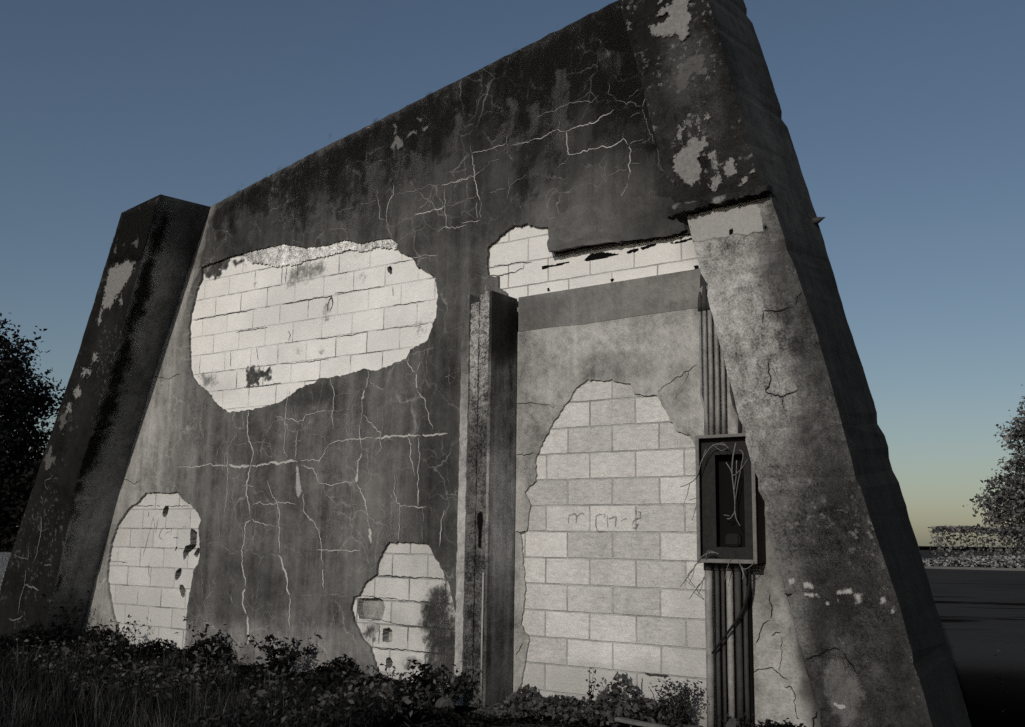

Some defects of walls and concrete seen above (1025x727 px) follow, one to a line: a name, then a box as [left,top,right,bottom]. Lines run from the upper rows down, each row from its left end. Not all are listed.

peeling [648,0,695,44]
leakage [392,119,428,149]
crack [331,85,653,258]
peeling [672,108,756,192]
spalling [191,239,438,412]
spalling [489,224,700,301]
crack [765,360,799,408]
spalling [109,492,201,652]
crack [177,362,447,644]
spalling [353,542,456,692]
spalling [521,380,707,711]
crack [754,593,817,727]